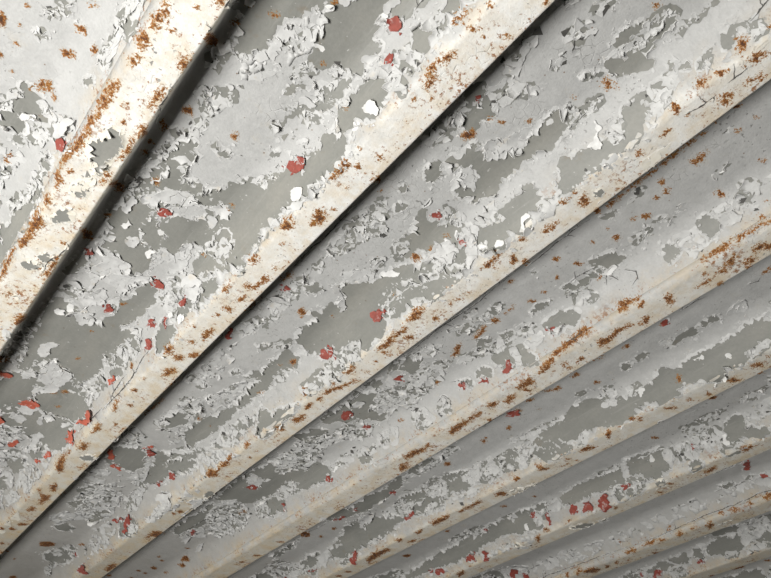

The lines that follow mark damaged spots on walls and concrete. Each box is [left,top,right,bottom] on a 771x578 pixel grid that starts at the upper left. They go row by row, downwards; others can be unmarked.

peeling [548,0,621,72]
peeling [574,0,720,83]
peeling [719,18,770,63]
rust [142,83,171,110]
peeling [655,176,763,267]
peeling [48,42,716,560]
peeling [249,300,771,578]
peeling [35,545,79,577]